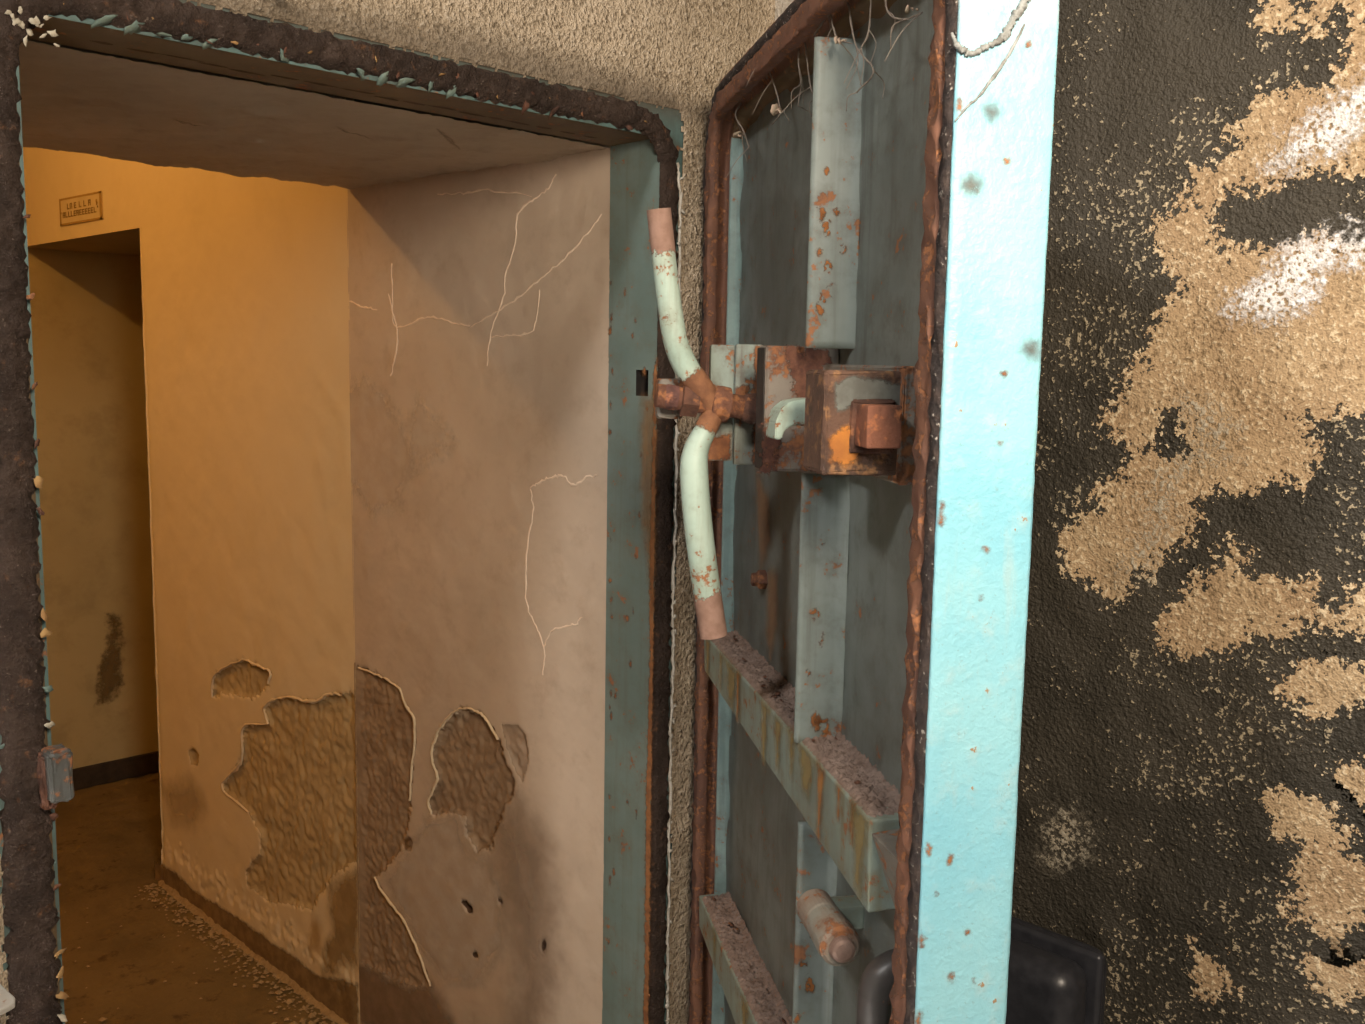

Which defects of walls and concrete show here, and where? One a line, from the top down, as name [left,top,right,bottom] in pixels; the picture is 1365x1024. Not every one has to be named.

rust [679,0,860,588]
leakage [96,614,122,703]
spalling [210,659,529,990]
crack [525,474,598,675]
rust [688,621,739,1024]
rust [761,704,866,887]
rust [889,0,962,1024]